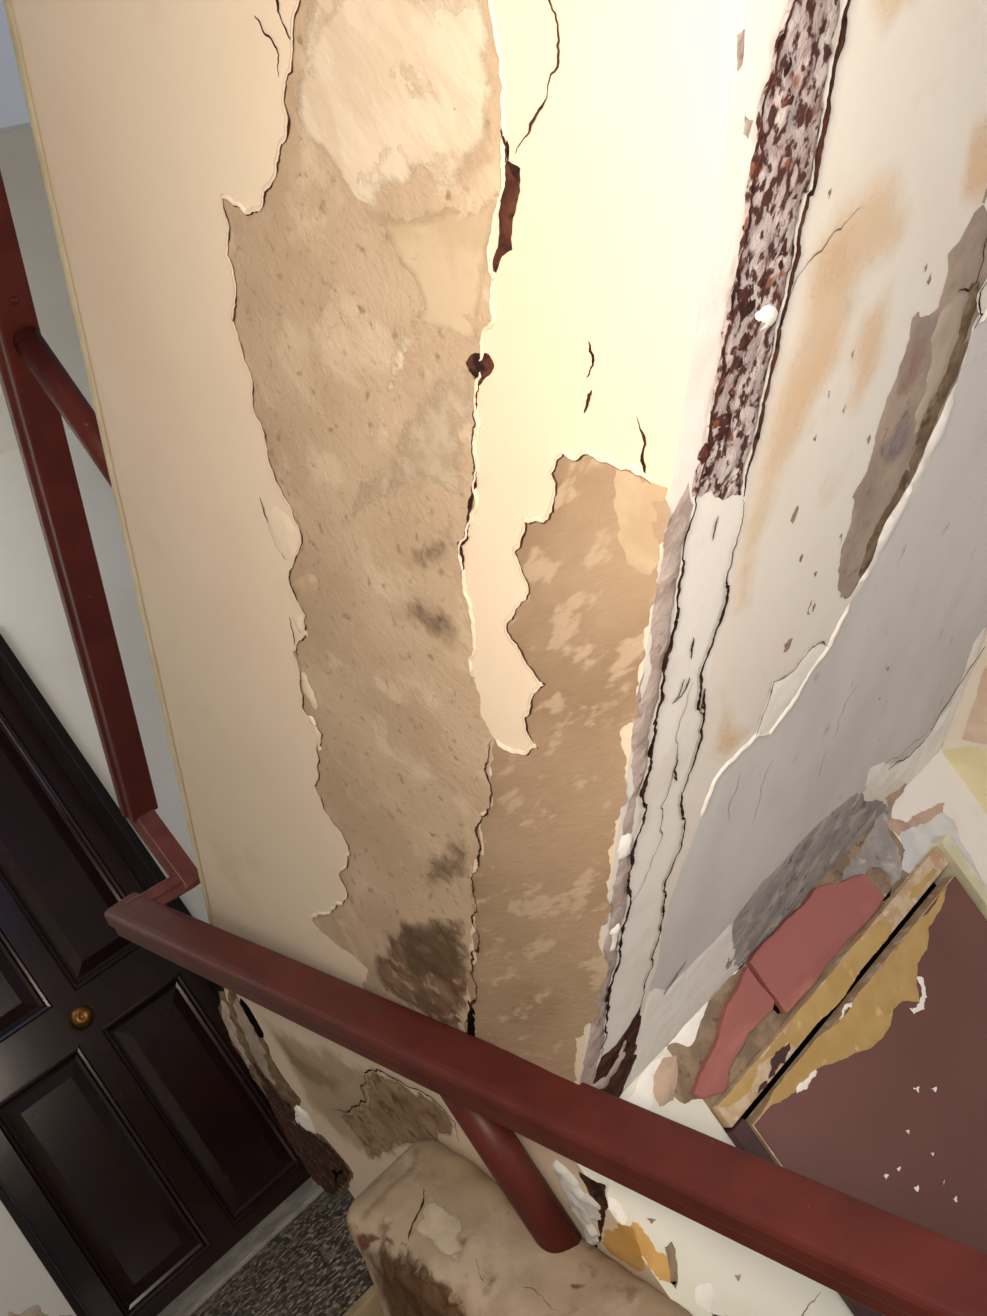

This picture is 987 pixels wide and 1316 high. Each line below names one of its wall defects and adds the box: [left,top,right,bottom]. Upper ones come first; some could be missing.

spalling [743,115,753,139]
corrosion [692,0,851,500]
peeling [220,0,694,1086]
crack [457,381,479,572]
peeling [627,189,987,1120]
crack [601,482,744,1055]
crack [465,742,493,1036]
peeling [334,1069,459,1159]
peeling [8,1305,72,1316]
peeling [408,1190,462,1261]
peeling [552,1159,678,1288]
peeling [695,1283,718,1316]